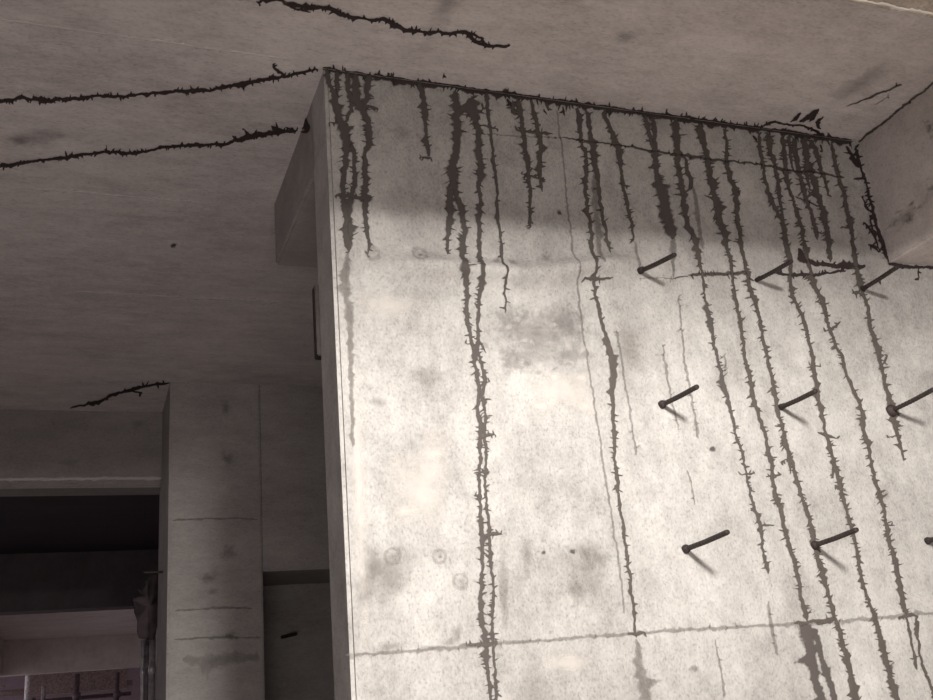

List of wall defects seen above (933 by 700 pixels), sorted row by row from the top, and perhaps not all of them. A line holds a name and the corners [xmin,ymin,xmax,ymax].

crack [256,0,510,50]
crack [0,63,933,180]
crack [673,270,754,281]
crack [776,248,933,285]
crack [70,380,170,409]